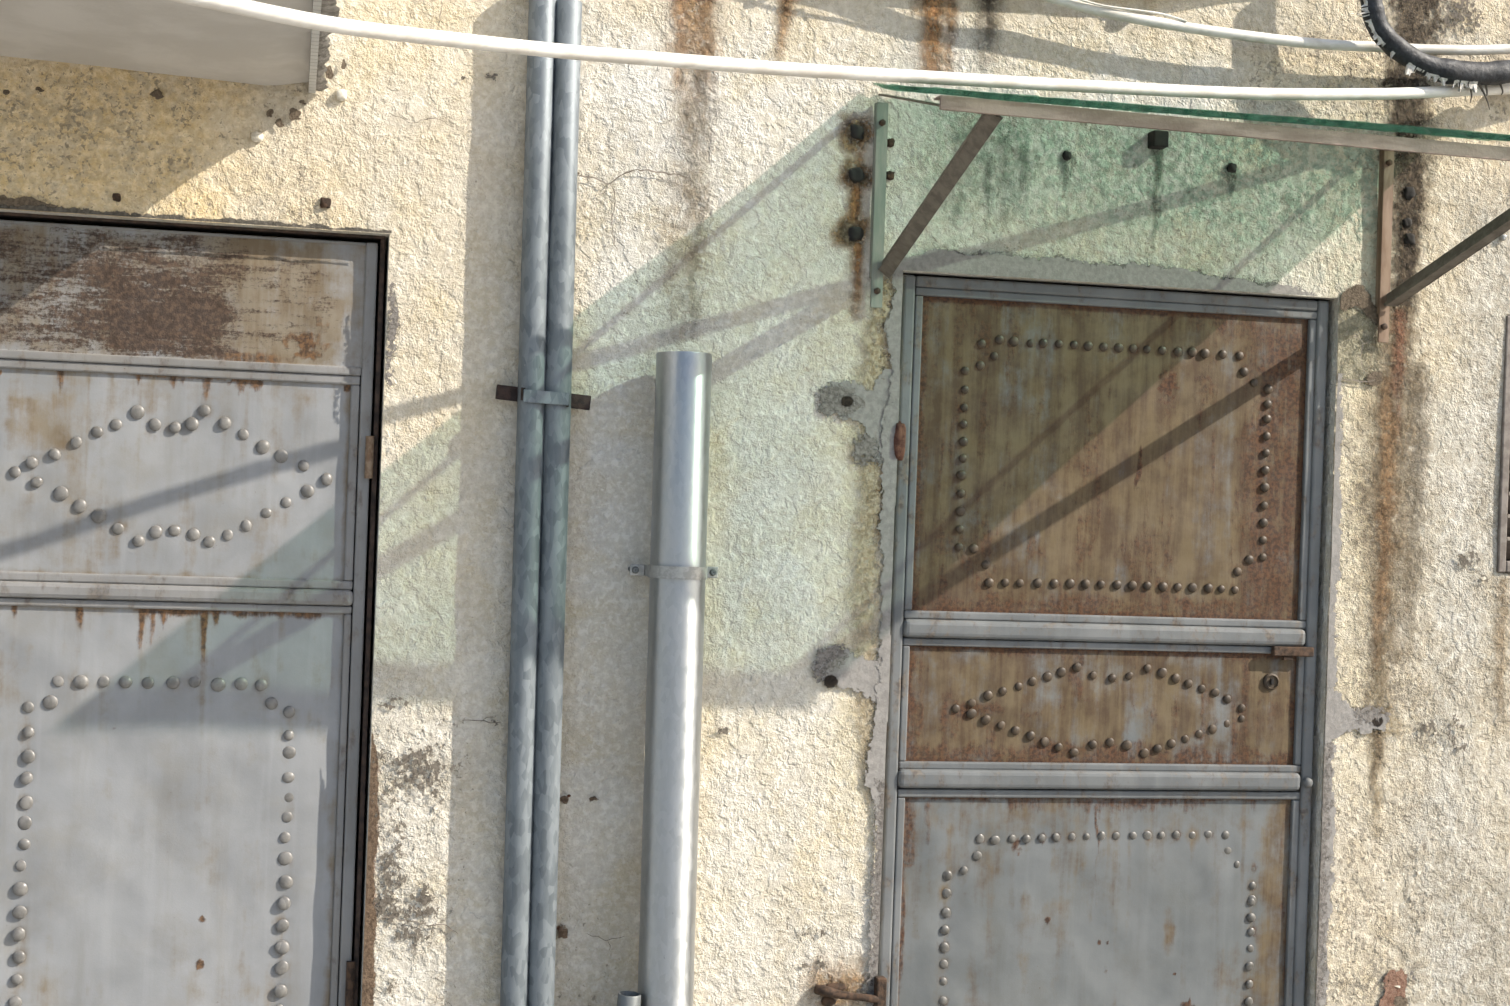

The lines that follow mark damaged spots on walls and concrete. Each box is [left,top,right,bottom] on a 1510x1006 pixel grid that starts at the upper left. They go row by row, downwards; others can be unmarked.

rust [678,0,714,56]
rust [923,0,956,71]
leakage [1390,0,1490,44]
crack [577,169,688,248]
rust [832,118,874,287]
rust [1362,306,1425,815]
spalling [811,247,1315,1006]
peeling [371,734,458,950]
peeling [794,928,829,969]
spalling [1379,968,1416,1006]